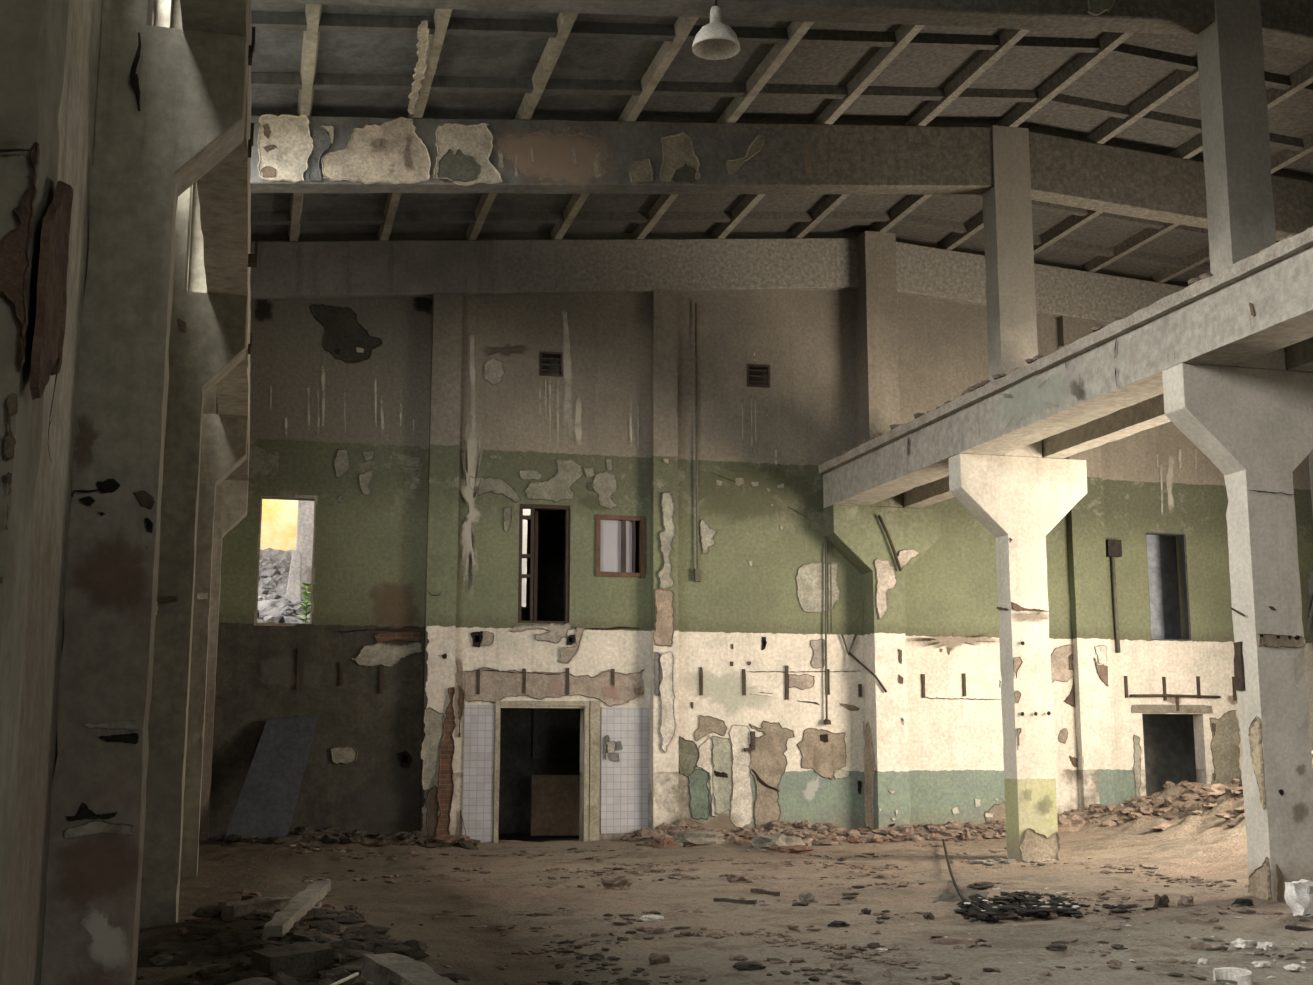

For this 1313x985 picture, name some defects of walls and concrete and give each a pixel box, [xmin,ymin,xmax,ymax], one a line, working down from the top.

peeling [257,20,503,186]
spalling [311,304,382,363]
spalling [78,478,154,548]
peeling [469,459,619,533]
flaking render [397,492,898,838]
spalling [999,656,1023,703]
flaking render [1051,644,1076,707]
spalling [1058,728,1084,767]
spalling [1209,710,1266,810]